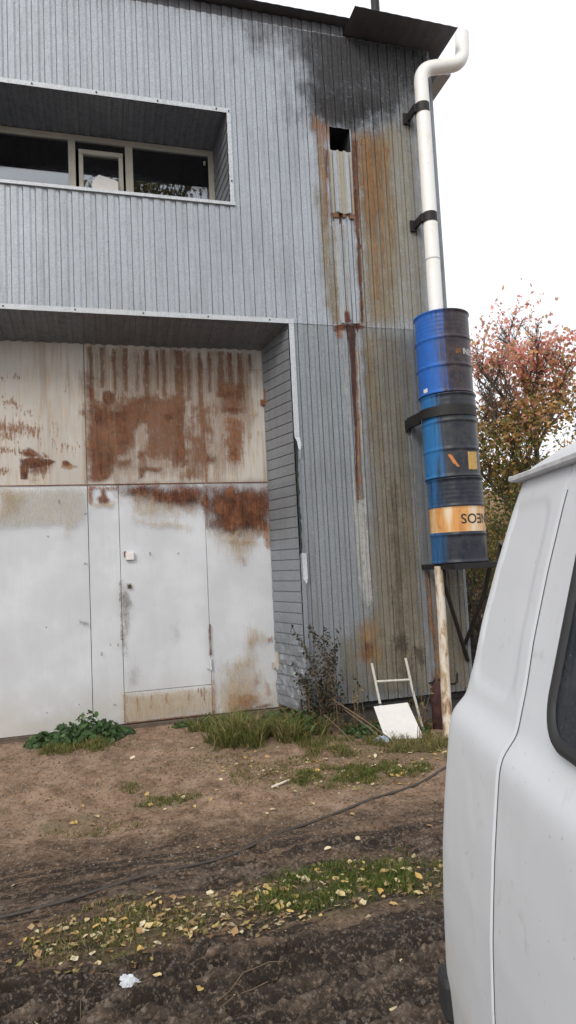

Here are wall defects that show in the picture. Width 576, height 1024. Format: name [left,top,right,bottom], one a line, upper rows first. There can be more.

leakage [252,23,427,127]
corrosion [313,119,392,502]
corrosion [0,347,270,556]